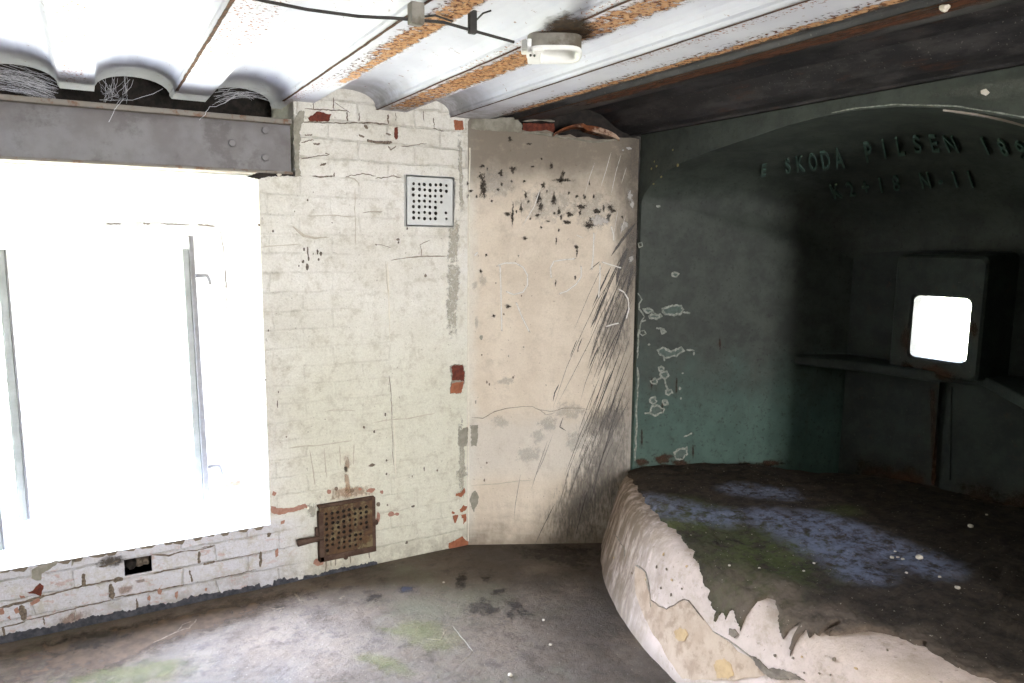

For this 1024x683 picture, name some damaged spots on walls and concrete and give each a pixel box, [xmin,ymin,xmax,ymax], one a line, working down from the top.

corrosion [282,0,484,103]
corrosion [376,39,531,110]
corrosion [451,0,991,120]
spalling [449,364,465,394]
water stain [446,141,636,569]
peeling [634,293,695,461]
peeling [271,491,315,524]
corrosion [327,487,380,522]
spalling [0,525,265,620]
peeling [631,553,805,681]